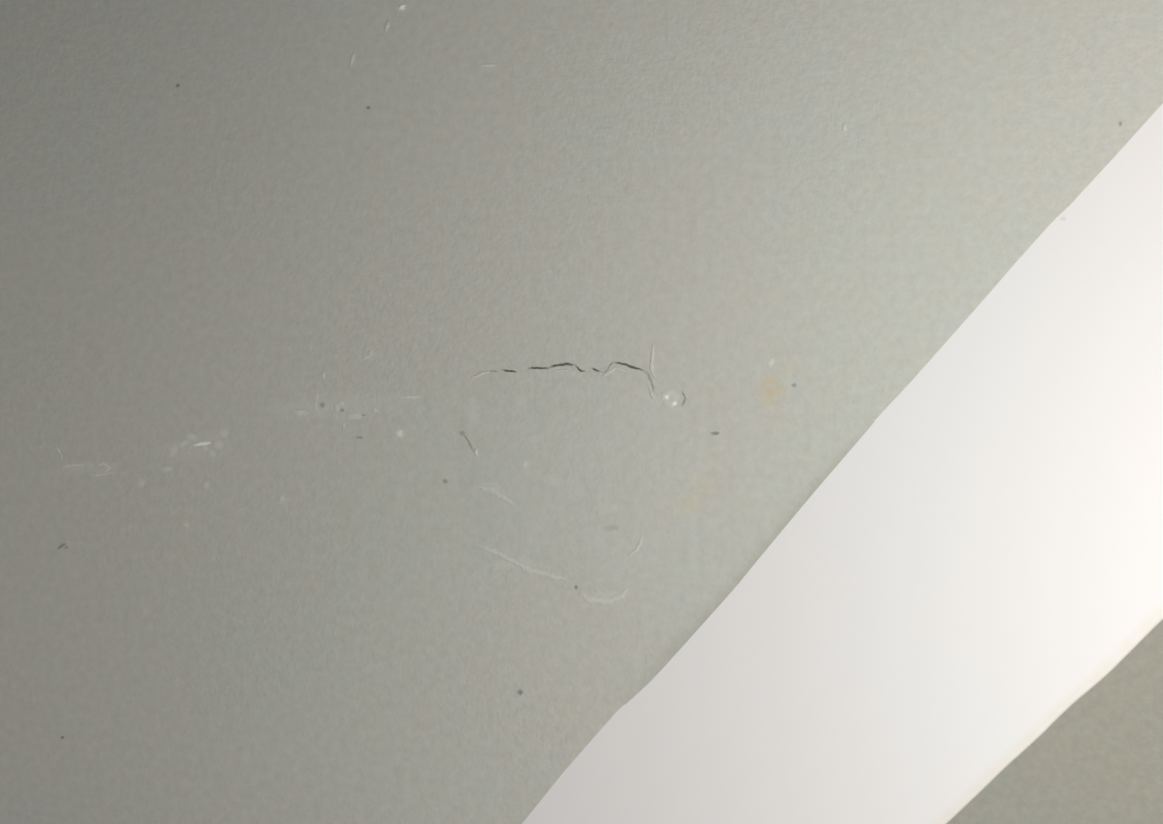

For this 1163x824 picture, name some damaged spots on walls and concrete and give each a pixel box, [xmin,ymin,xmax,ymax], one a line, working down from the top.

crack [471,342,656,401]